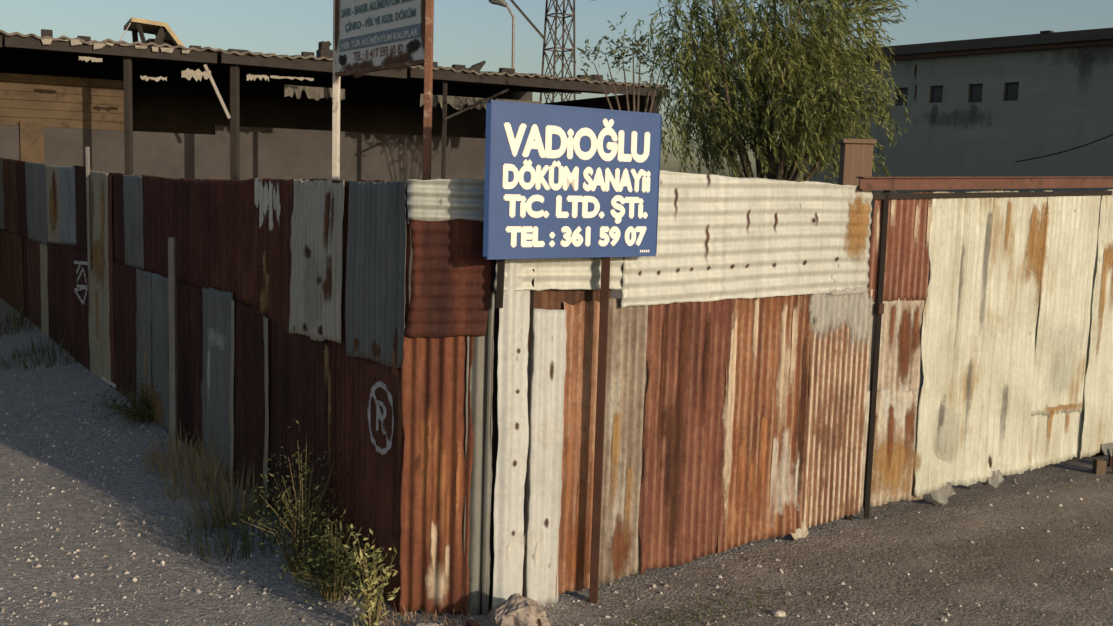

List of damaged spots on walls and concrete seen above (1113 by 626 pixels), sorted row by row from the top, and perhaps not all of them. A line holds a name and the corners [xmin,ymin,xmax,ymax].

peeling [254,177,281,231]
rust [317,260,332,299]
rust [324,193,334,245]
rust [836,197,870,261]
rust [1026,205,1049,287]
rust [1097,245,1113,348]
rust [890,305,921,385]
rust [422,414,461,542]
rust [658,306,688,537]
rust [797,327,809,491]
rust [871,403,919,498]
rust [1047,404,1082,438]